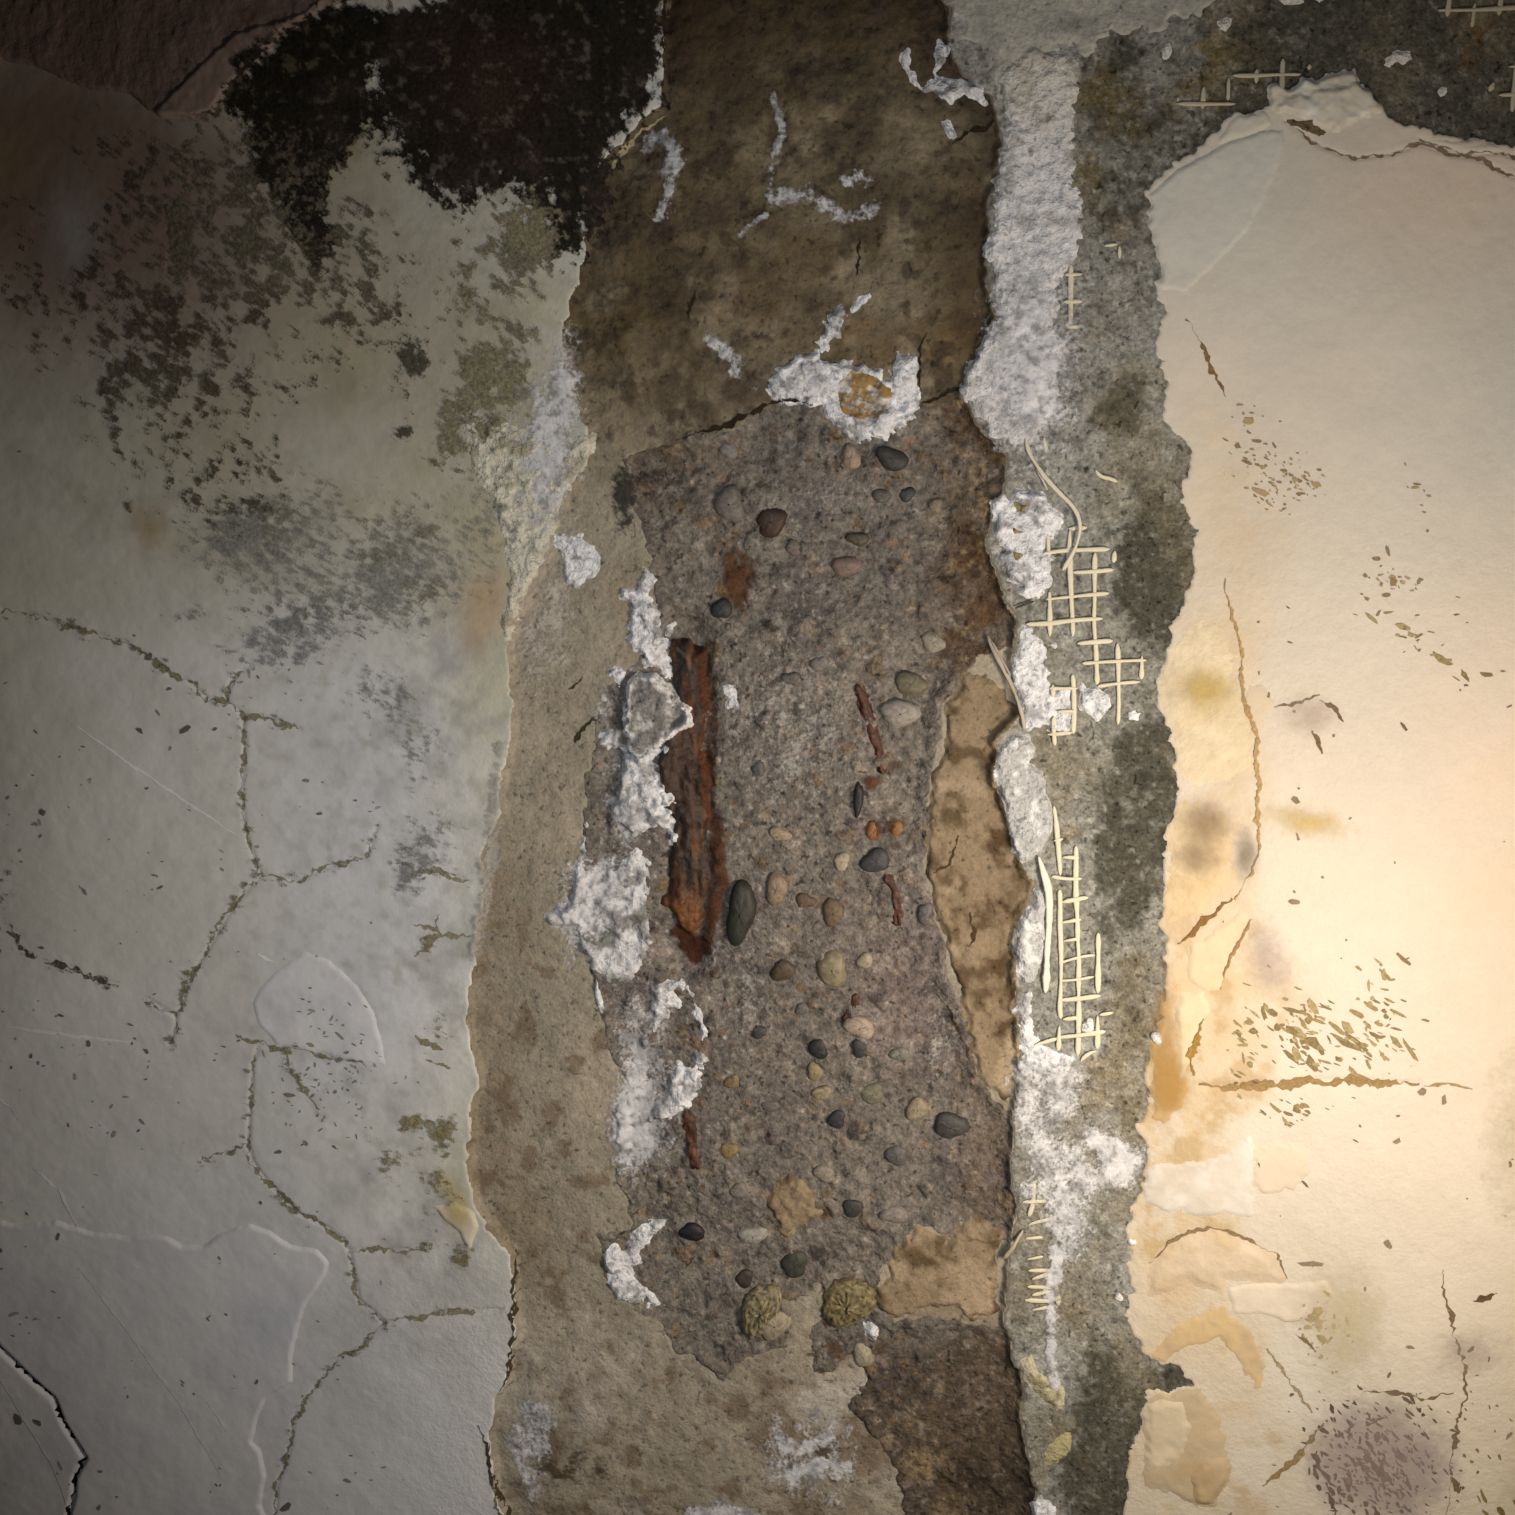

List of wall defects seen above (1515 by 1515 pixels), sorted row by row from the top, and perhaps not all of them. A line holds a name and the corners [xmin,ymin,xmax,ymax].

leakage [0,0,685,789]
leakage [982,239,1085,478]
crack [2,608,471,1051]
efflorescence [543,566,709,1186]
corrosion [672,651,729,964]
corrosion [865,777,880,789]
spalling [434,0,1515,1515]
crack [1178,579,1473,1092]
crack [200,1034,519,1515]
efflorescence [603,1217,667,1309]
efflorescence [1006,1058,1146,1390]
crack [1364,1270,1468,1514]